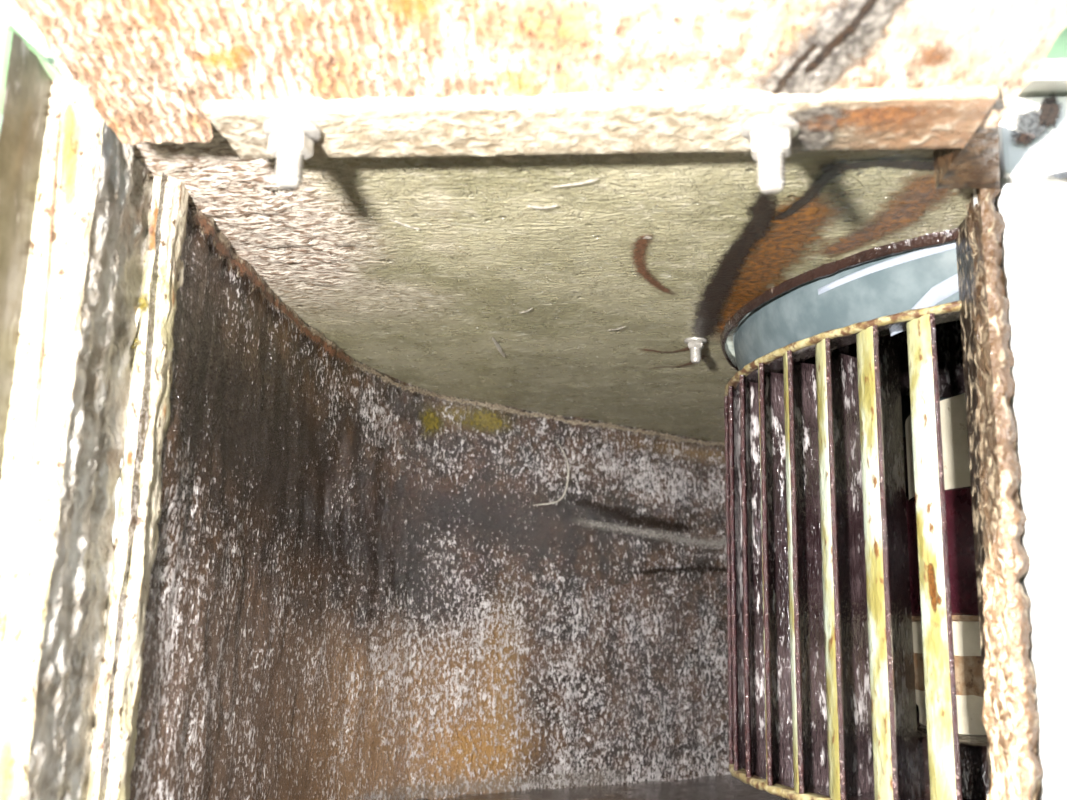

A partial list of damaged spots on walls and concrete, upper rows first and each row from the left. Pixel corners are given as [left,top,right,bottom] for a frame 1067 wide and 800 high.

corrosion [209,52,237,68]
leakage [771,0,878,95]
corrosion [922,42,948,66]
corrosion [816,105,930,131]
leakage [577,500,694,530]
leakage [634,566,727,574]
corrosion [0,739,12,800]